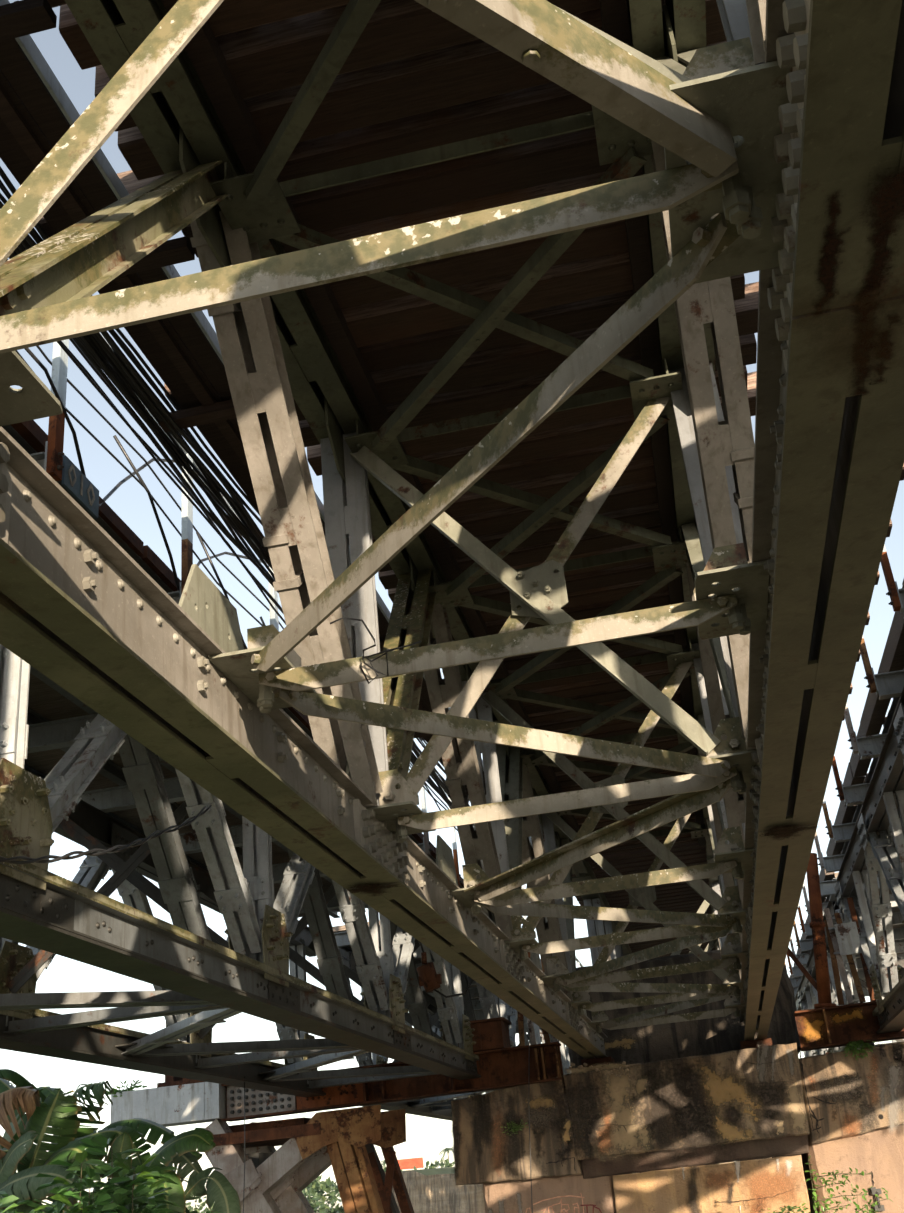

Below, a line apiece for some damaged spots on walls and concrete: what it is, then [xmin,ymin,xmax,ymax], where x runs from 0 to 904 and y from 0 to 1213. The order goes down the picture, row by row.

corrosion [815,193,850,316]
corrosion [851,168,904,396]
water stain [451,1080,603,1178]
water stain [628,1064,743,1213]
water stain [747,1043,794,1134]
water stain [880,1044,904,1131]